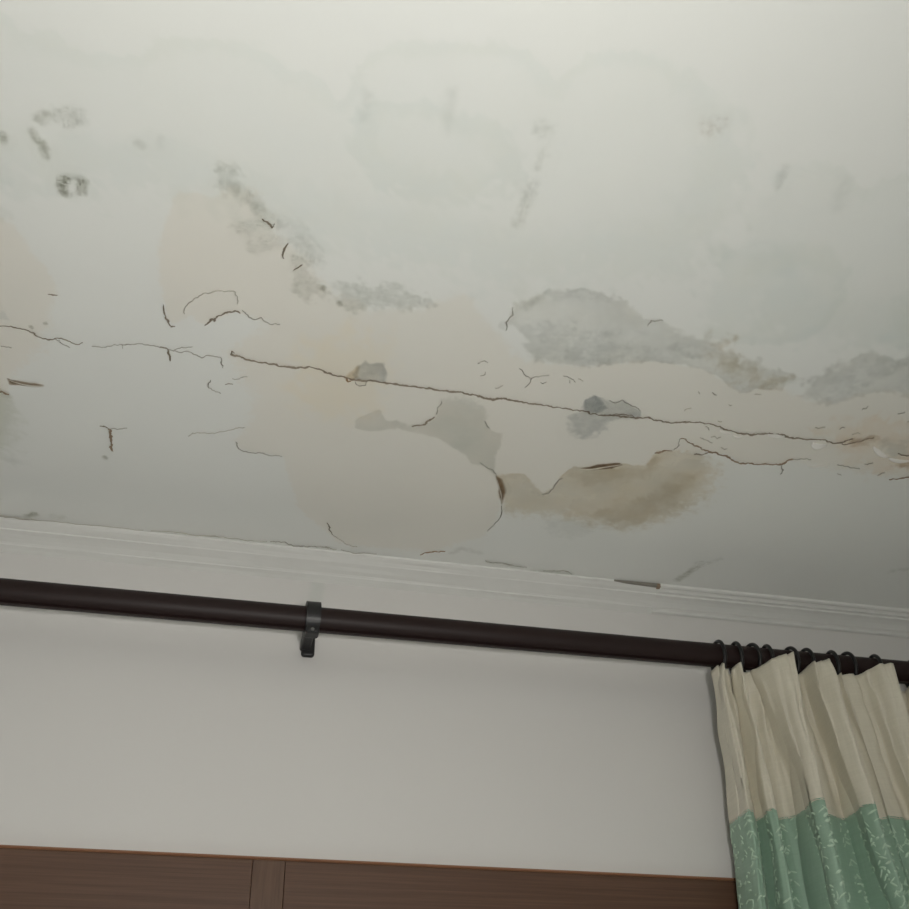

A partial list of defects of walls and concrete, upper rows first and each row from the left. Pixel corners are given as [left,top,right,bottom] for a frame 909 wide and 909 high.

crack [0,326,909,480]